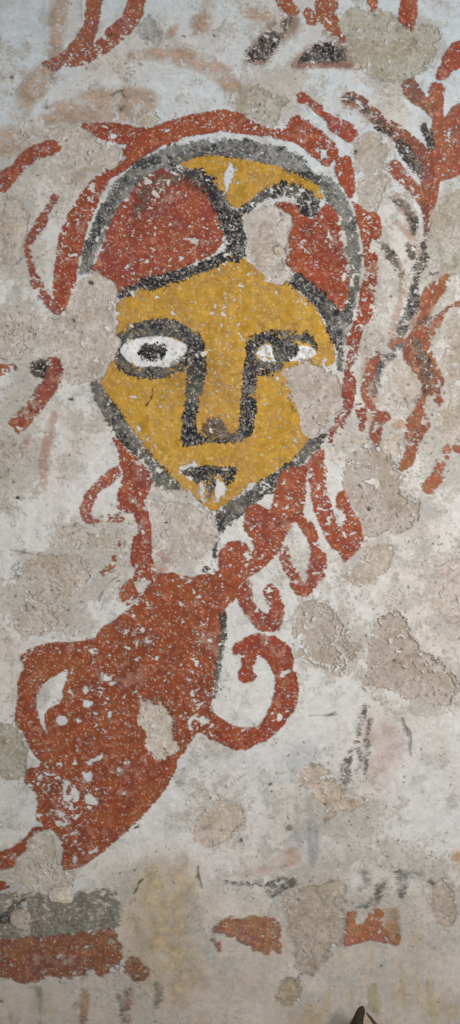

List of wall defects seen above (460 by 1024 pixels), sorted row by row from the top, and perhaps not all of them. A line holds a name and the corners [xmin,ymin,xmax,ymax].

spalling [338,6,442,84]
spalling [241,205,295,286]
spalling [281,358,346,437]
spalling [341,433,421,585]
spalling [289,599,460,707]
spalling [0,722,28,780]
spalling [137,695,181,761]
spalling [190,799,247,848]
spalling [299,763,368,827]
spalling [275,879,349,1006]